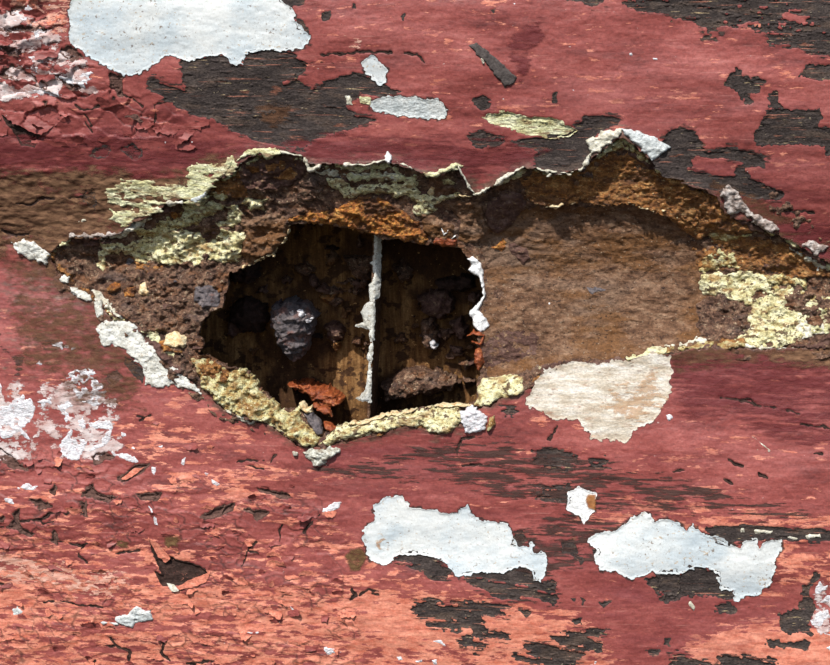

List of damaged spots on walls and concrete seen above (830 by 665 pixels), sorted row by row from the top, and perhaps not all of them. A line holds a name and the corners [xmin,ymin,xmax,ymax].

peeling [0,0,448,161]
peeling [467,95,625,175]
peeling [652,67,830,202]
peeling [499,351,674,443]
crack [19,507,72,525]
crack [58,541,88,564]
crack [43,600,103,608]
crack [349,588,379,600]
peeling [362,495,611,665]
peeling [587,512,830,614]
crack [93,637,132,663]
crack [159,641,217,665]